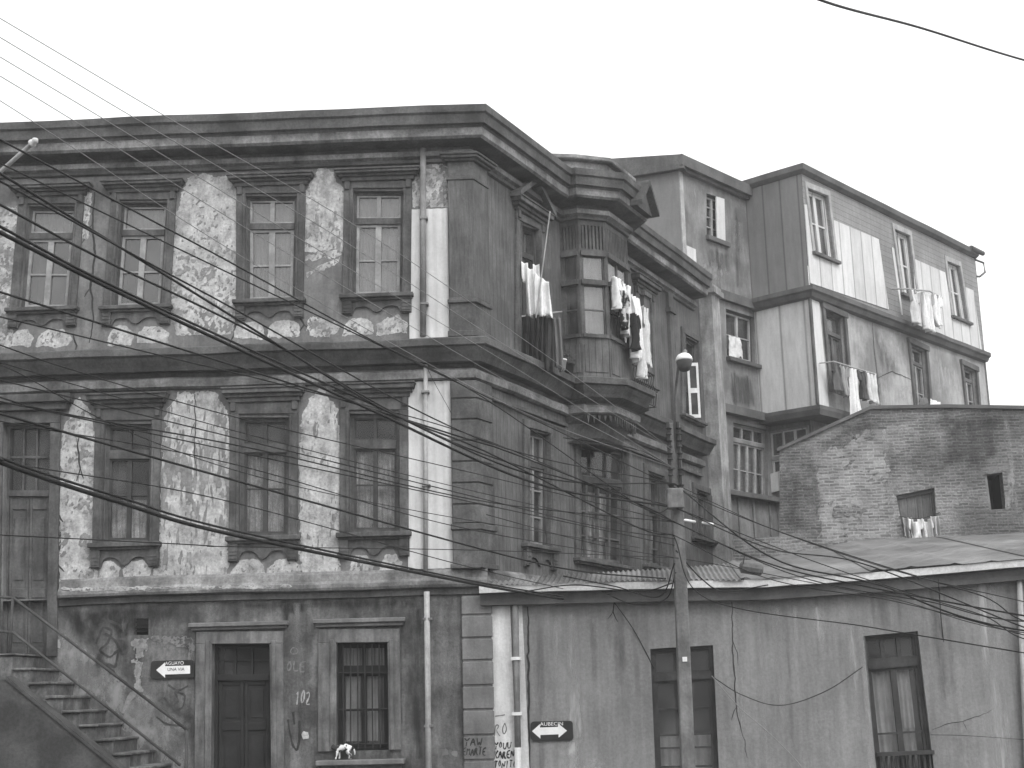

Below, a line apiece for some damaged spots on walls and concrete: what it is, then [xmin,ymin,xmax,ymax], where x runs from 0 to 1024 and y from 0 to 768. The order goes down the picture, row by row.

peeling [0,206,72,349]
crack [73,192,96,350]
peeling [107,168,408,346]
peeling [412,164,448,208]
crack [76,437,84,481]
crack [189,395,197,473]
peeling [59,388,402,592]
peeling [56,633,196,768]